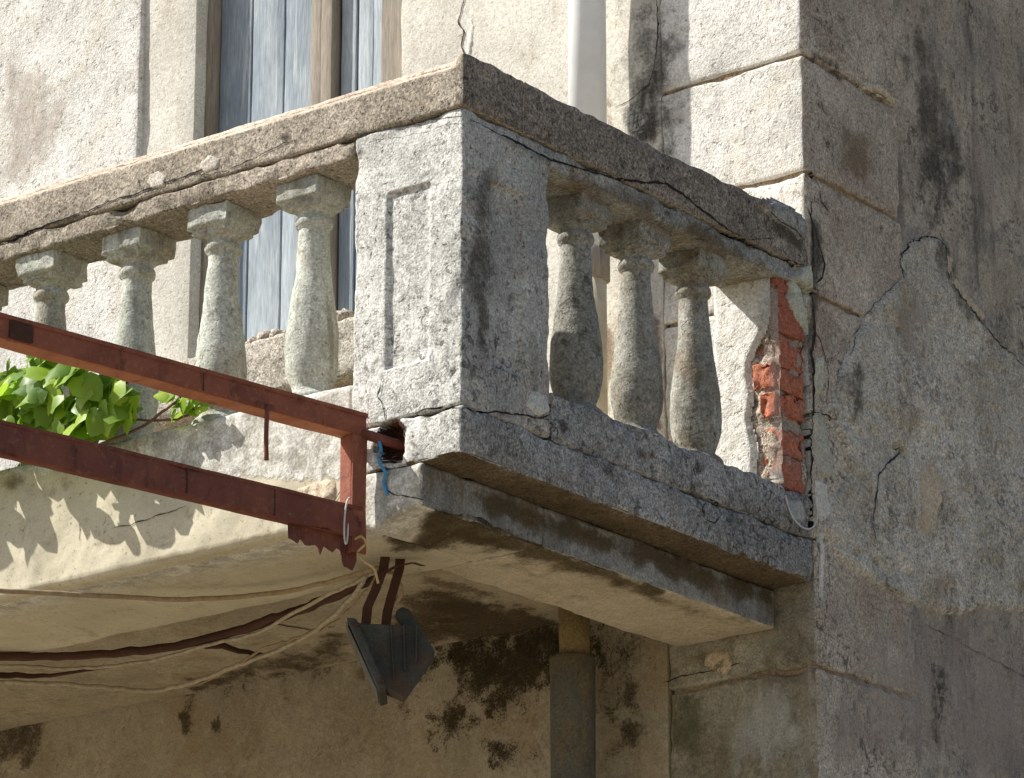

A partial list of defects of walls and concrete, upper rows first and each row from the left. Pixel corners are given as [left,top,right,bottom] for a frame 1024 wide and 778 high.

crack [457,1,465,53]
water stain [623,9,681,141]
water stain [903,38,964,199]
crack [0,139,297,244]
crack [359,116,831,530]
crack [851,235,1023,365]
flaking render [752,277,836,521]
crack [111,506,185,529]
water stain [387,493,773,604]
crack [873,447,901,538]
water stain [395,576,559,771]
water stain [590,624,647,758]